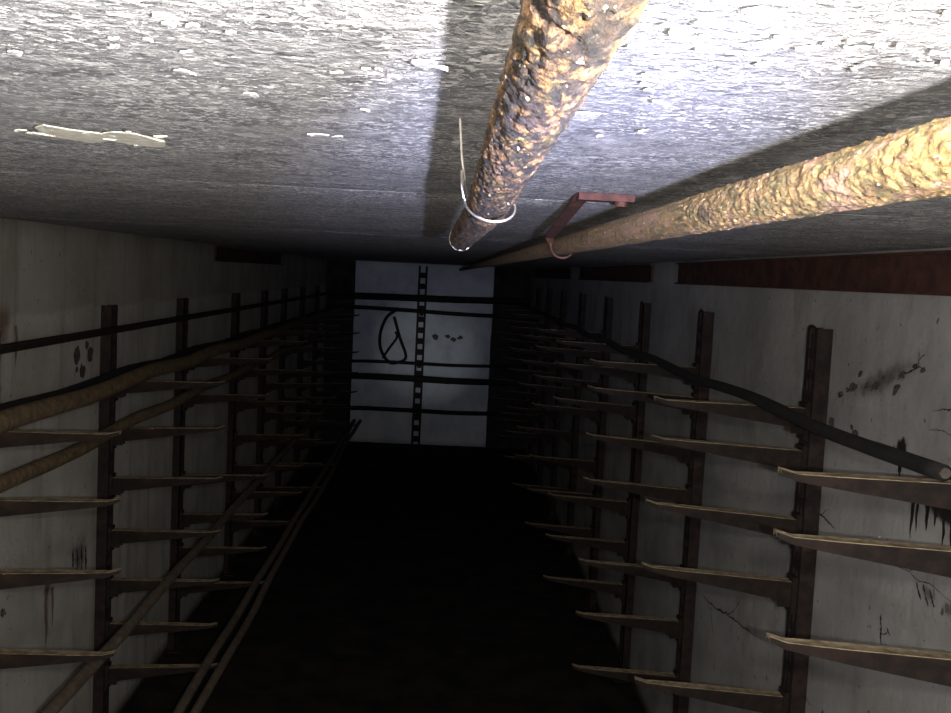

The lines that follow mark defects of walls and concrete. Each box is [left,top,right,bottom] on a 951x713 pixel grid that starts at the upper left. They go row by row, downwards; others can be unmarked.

peeling [14,124,168,148]
water stain [909,503,951,546]